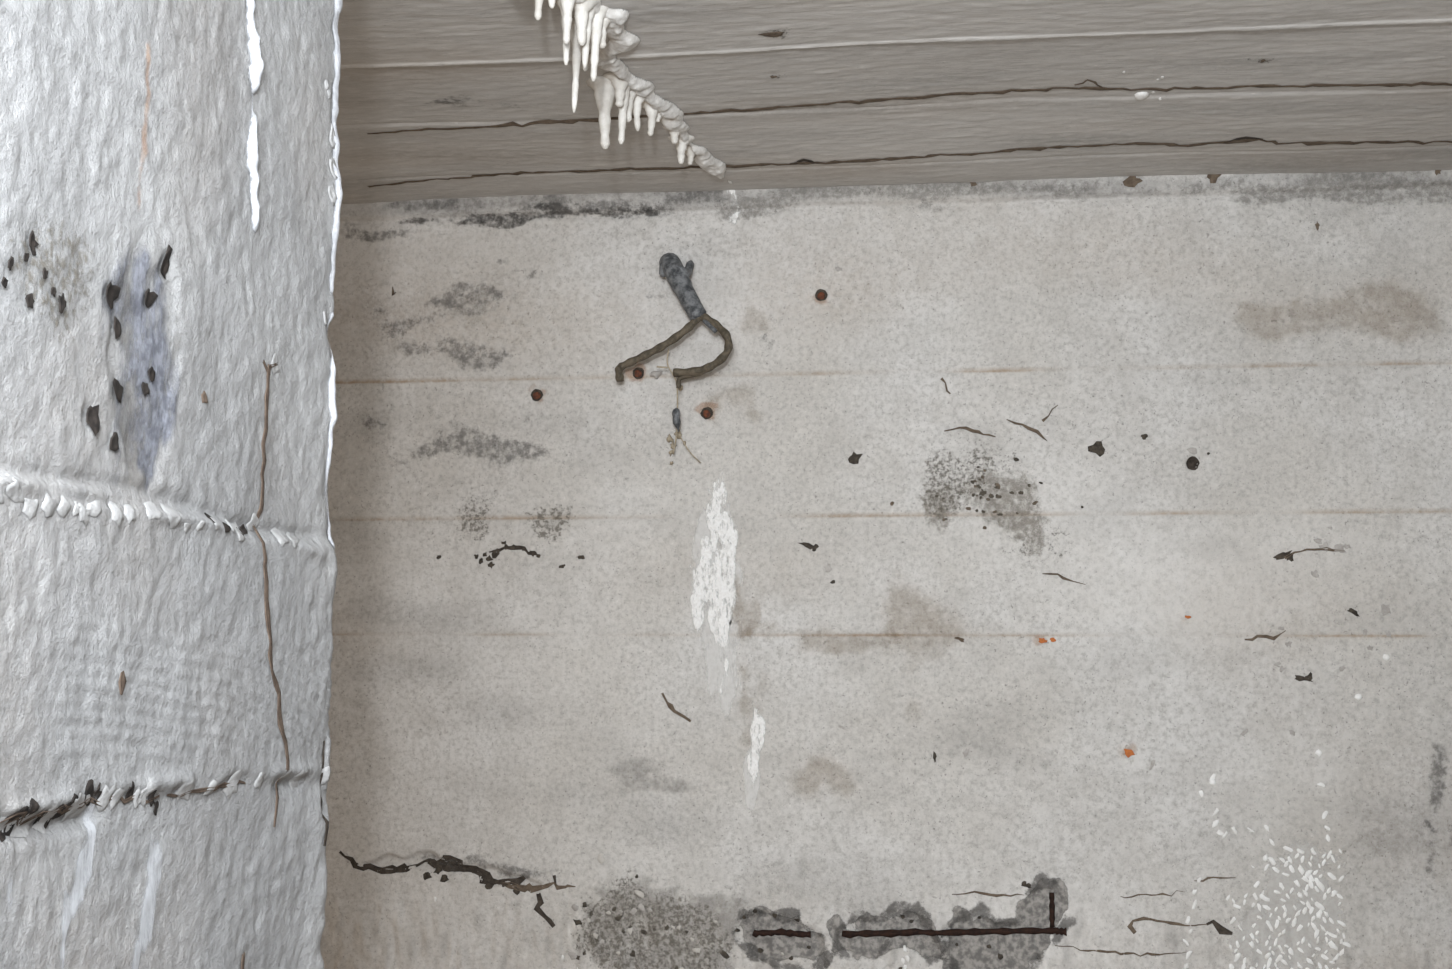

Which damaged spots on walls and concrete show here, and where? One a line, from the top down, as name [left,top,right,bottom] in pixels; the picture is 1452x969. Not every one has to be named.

damp [246,0,264,233]
damp [330,0,343,293]
damp [364,202,443,241]
damp [462,0,741,228]
crack [252,352,289,827]
damp [325,312,338,549]
damp [690,480,742,715]
damp [925,440,1043,529]
crack [339,851,575,928]
spalling [733,873,1076,969]
damp [1183,877,1201,969]
damp [1199,774,1351,969]